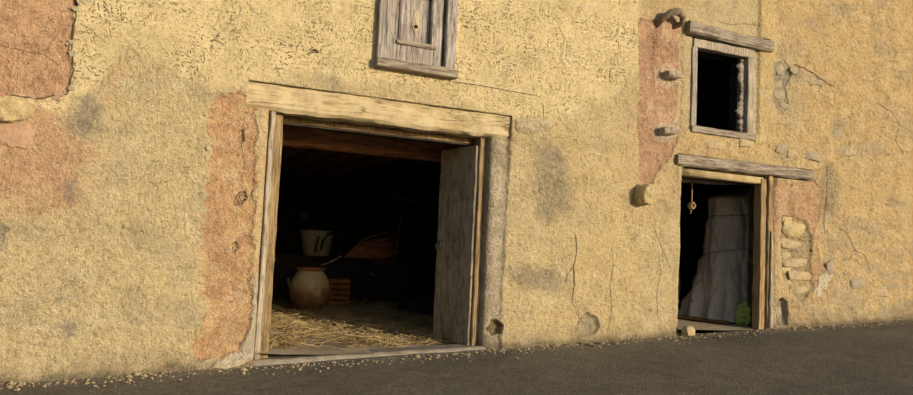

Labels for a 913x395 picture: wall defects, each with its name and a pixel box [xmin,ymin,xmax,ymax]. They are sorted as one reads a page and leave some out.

flaking render [0,0,83,101]
flaking render [637,18,680,184]
flaking render [193,91,259,362]
flaking render [486,318,504,336]
crack [564,236,580,330]
flaking render [577,312,600,337]
flaking render [776,180,824,327]